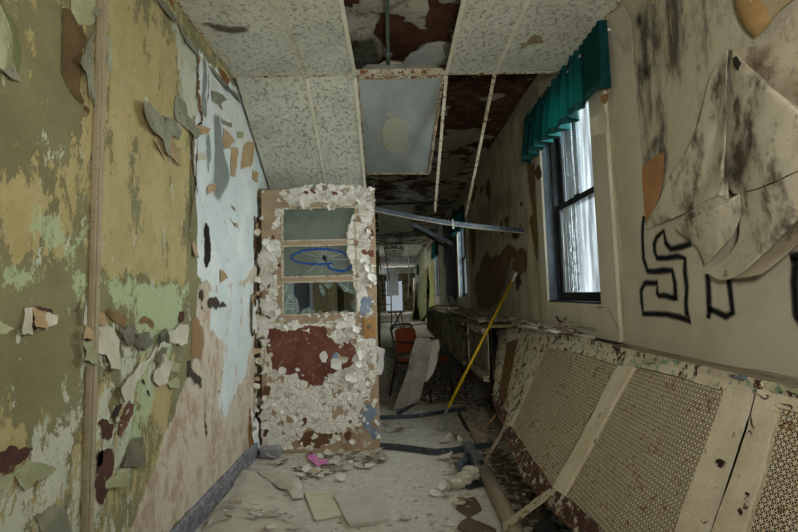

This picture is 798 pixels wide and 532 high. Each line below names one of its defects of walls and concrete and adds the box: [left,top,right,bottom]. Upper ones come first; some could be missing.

spalling [373,0,460,77]
peeling [589,94,608,139]
peeling [642,152,664,222]
peeling [211,76,385,450]
spalling [423,209,458,307]
peeling [470,163,542,310]
peeling [0,306,58,335]
peeling [83,298,157,370]
peeling [168,311,189,346]
peeling [153,354,173,387]
peeling [0,445,56,496]
peeling [95,401,134,505]